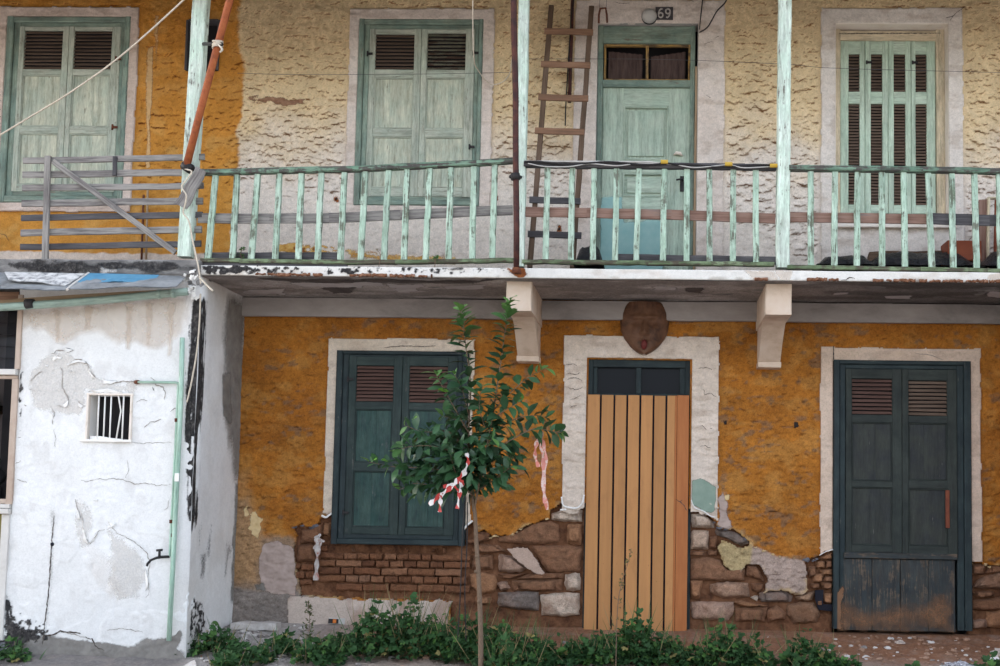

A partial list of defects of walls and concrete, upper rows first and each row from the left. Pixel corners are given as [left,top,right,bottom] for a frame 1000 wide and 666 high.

peeling [30,347,136,417]
leakage [185,298,206,531]
crack [42,518,143,651]
spalling [244,495,585,617]
spalling [690,479,833,624]